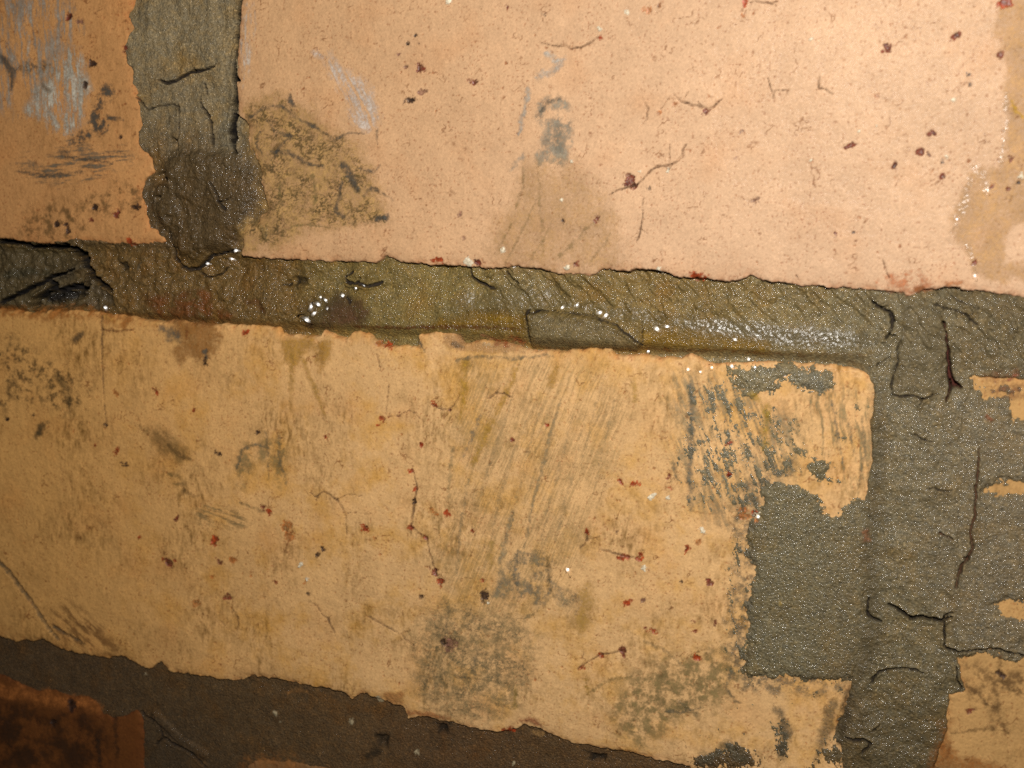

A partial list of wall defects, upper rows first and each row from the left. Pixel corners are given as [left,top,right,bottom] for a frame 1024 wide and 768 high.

crack [137,1,242,154]
damp [241,96,388,250]
crack [0,239,113,305]
crack [871,295,978,405]
crack [867,452,1023,687]
damp [775,709,790,756]